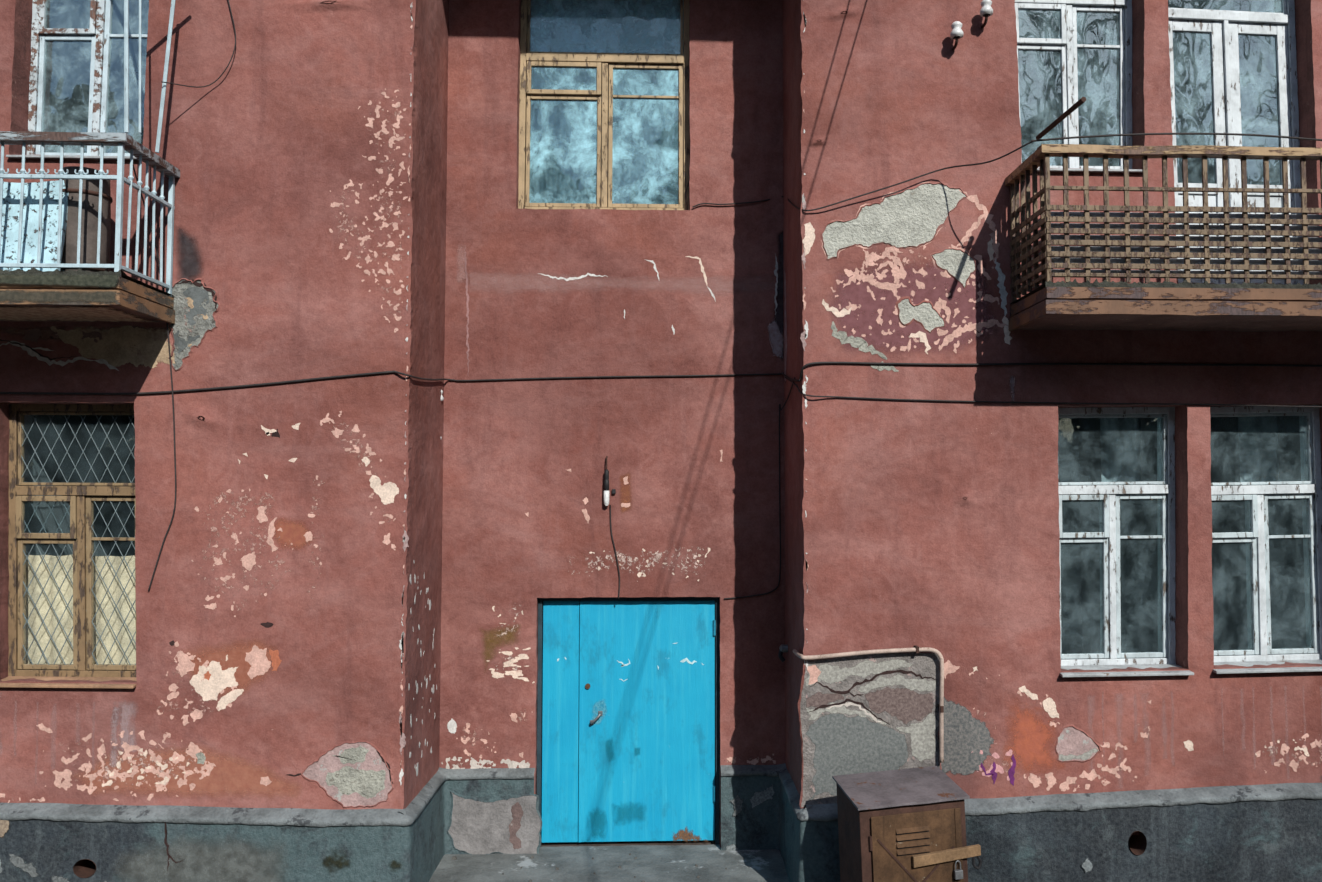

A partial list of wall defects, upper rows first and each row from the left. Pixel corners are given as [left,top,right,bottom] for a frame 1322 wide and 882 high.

peeling [329,73,412,445]
peeling [800,181,1012,372]
crack [0,339,119,371]
flaking render [139,278,220,371]
peeling [621,475,631,511]
peeling [0,411,535,808]
crack [808,670,937,724]
flaking render [798,652,1137,809]
peeling [1255,733,1322,773]
flaking render [0,820,9,837]
flaking render [446,791,542,855]
flaking render [0,854,69,882]